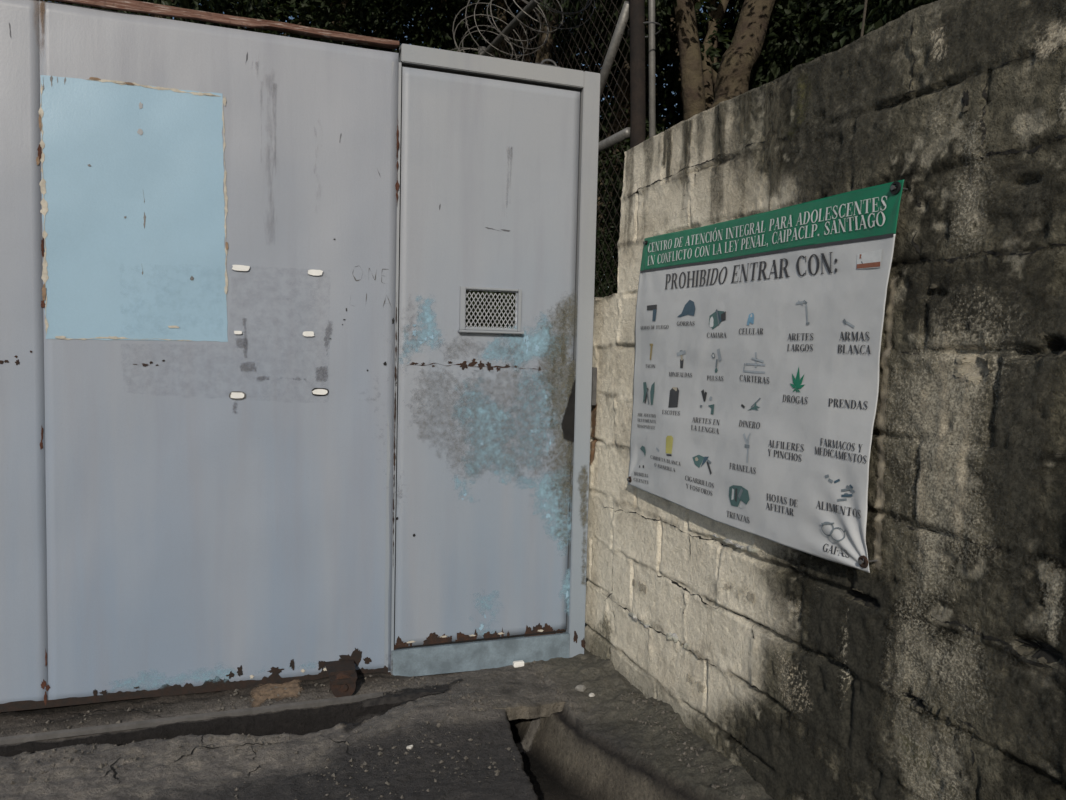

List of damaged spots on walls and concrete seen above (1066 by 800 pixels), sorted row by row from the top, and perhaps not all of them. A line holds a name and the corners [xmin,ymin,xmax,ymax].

leakage [662,130,671,183]
leakage [683,120,692,186]
leakage [714,103,725,179]
leakage [764,25,907,209]
peeling [483,318,561,367]
rust [383,307,555,546]
leakage [734,121,1066,800]
rust [0,659,329,712]
rust [339,648,388,674]
rust [394,628,510,650]
rust [524,623,565,637]